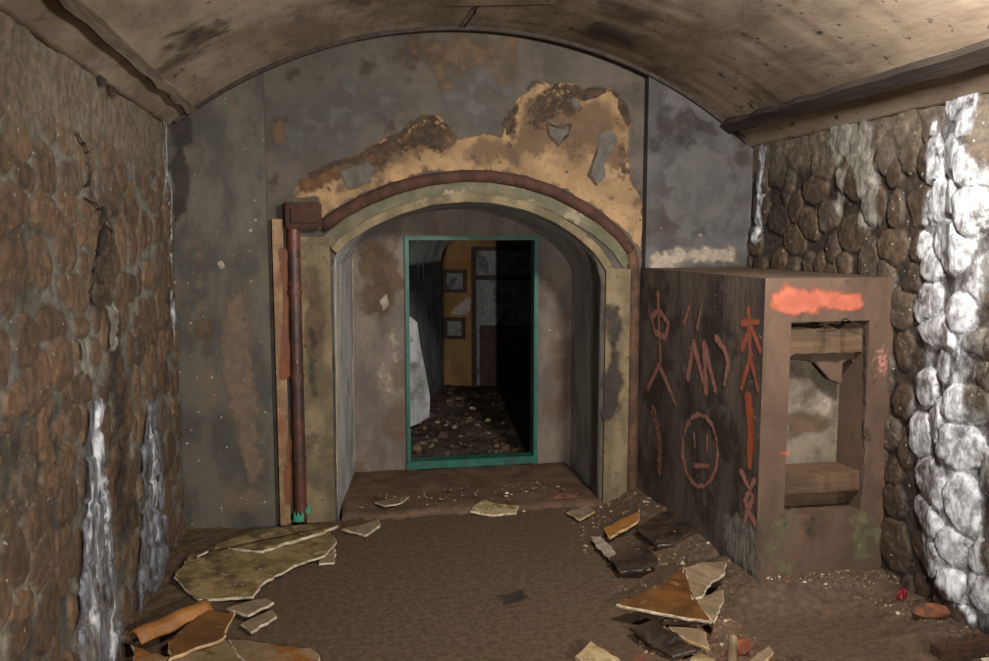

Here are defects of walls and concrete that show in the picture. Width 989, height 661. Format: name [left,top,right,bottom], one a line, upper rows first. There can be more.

damp [76,221,169,661]
peeling [289,80,736,268]
damp [909,93,989,624]